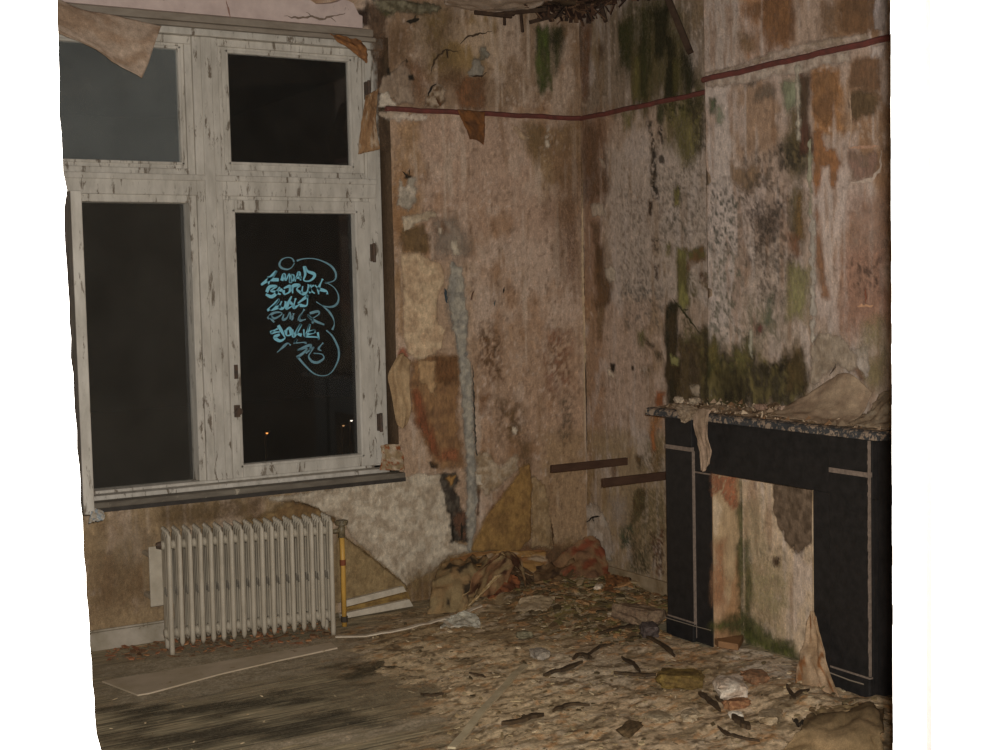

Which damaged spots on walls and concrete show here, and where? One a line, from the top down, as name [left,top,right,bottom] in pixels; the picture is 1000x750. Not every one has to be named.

crack [431,31,492,72]
damp [536,26,562,93]
flaking render [705,33,885,183]
damp [638,64,838,408]
flaking render [270,211,519,586]
damp [710,501,799,660]